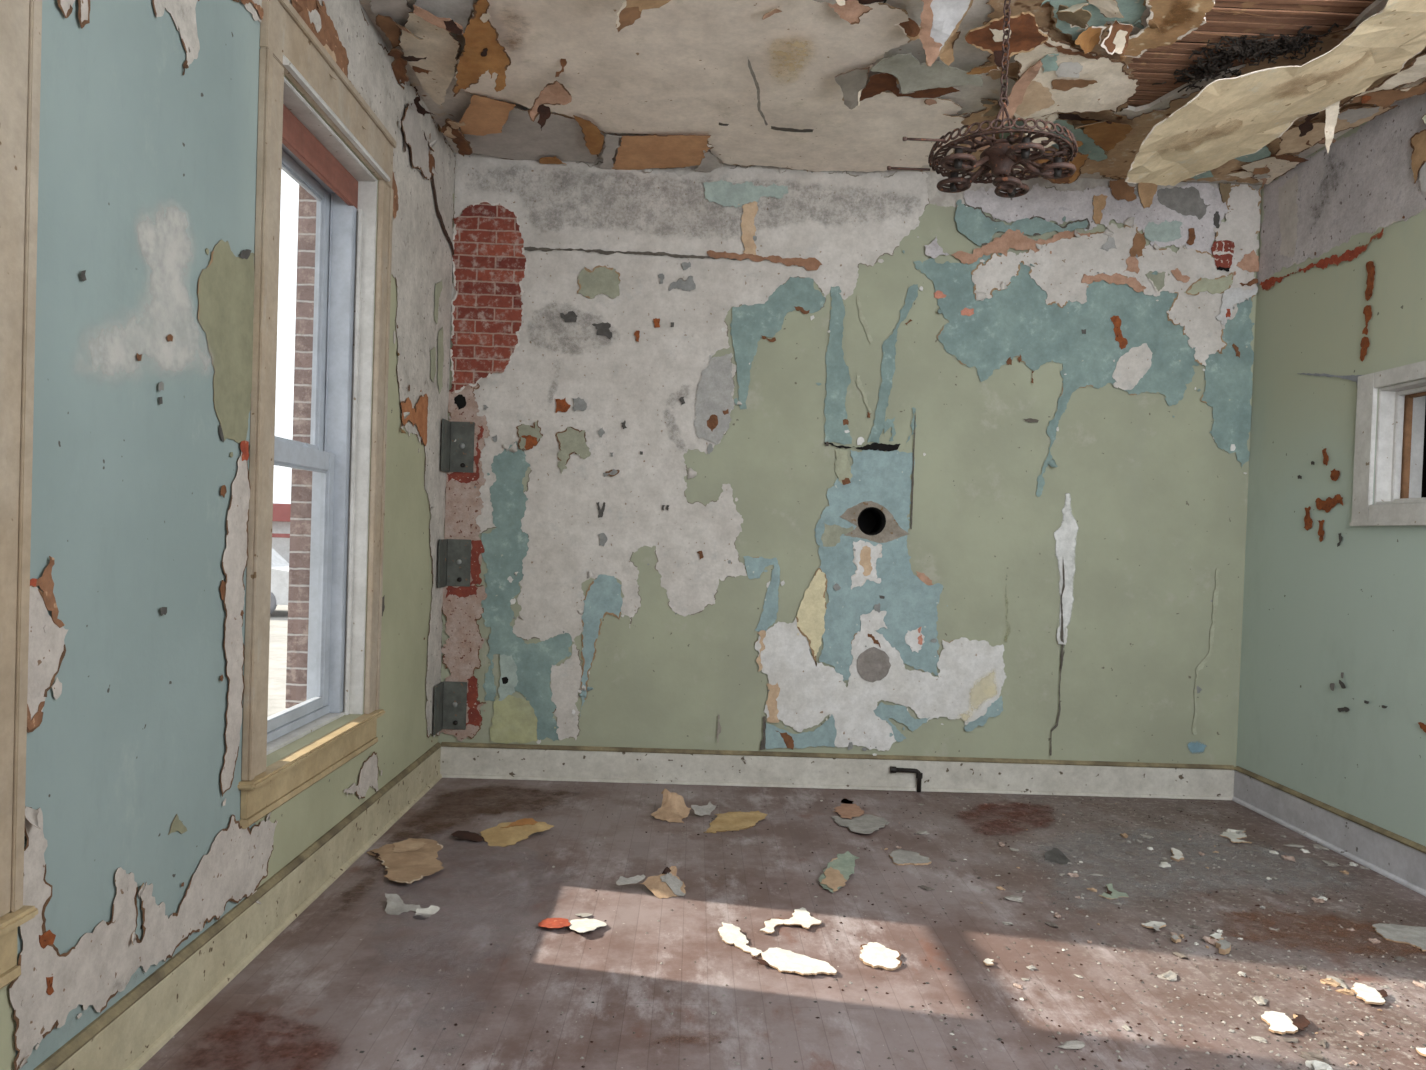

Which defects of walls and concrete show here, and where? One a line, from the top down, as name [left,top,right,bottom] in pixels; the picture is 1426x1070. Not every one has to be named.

flaking render [57,0,90,28]
flaking render [152,0,200,75]
flaking render [233,0,264,22]
crack [431,175,454,255]
crack [524,247,823,271]
flaking render [288,0,1426,756]
flaking render [9,240,277,1070]
crack [1050,560,1068,756]